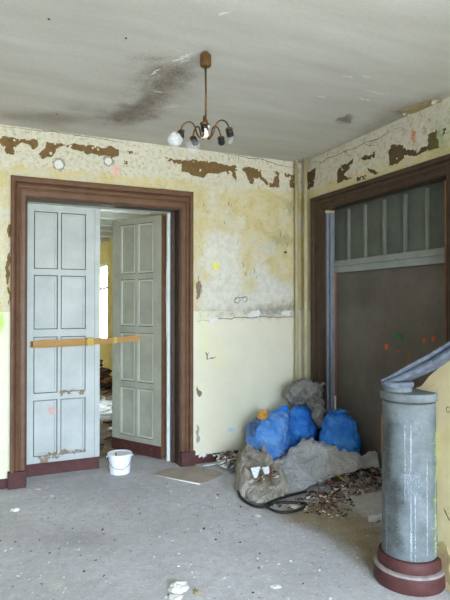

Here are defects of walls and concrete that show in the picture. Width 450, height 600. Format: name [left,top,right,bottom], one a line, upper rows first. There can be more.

water stain [1,49,200,128]
spalling [391,95,446,117]
peeling [0,136,133,164]
crack [311,127,400,164]
peeling [388,128,447,166]
peeling [165,157,294,188]
peeling [307,168,316,189]
peeling [335,152,380,184]
flaking render [194,204,300,324]
spalling [38,449,86,463]